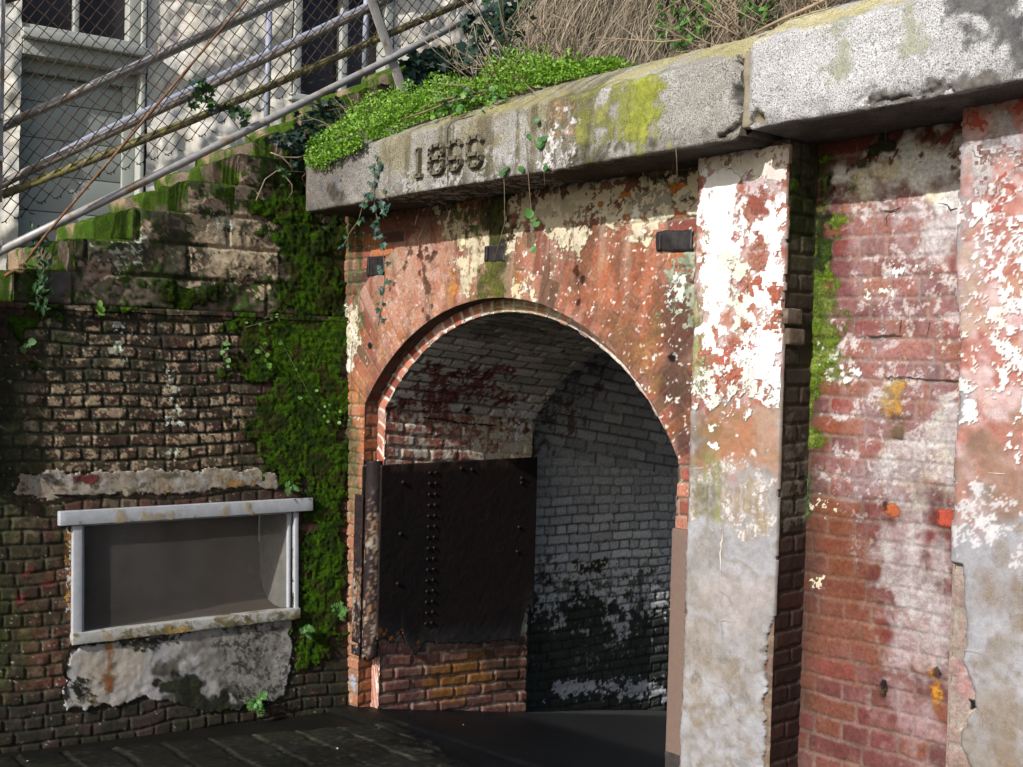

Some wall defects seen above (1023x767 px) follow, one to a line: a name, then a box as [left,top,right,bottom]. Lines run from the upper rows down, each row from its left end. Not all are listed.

water stain [597,69,667,166]
spalling [732,84,745,105]
spalling [846,133,900,173]
peeling [343,304,362,354]
peeling [432,205,489,299]
peeling [505,143,789,450]
peeling [818,341,862,384]
peeling [864,260,935,300]
peeling [956,150,1023,464]
peeling [385,364,494,434]
water stain [551,674,667,705]
spalling [952,659,977,732]